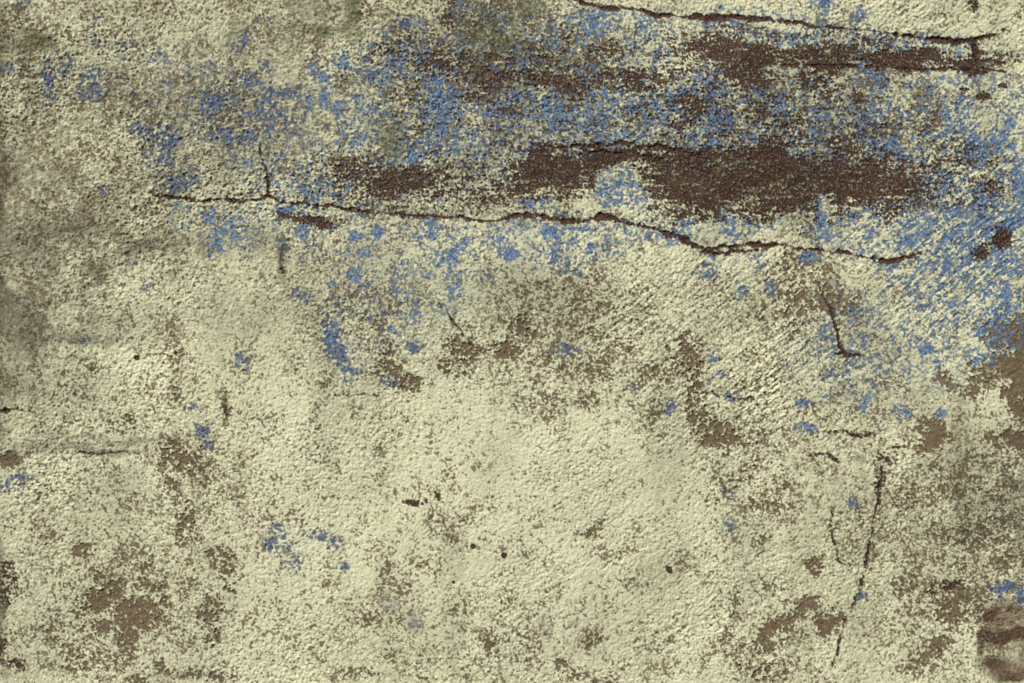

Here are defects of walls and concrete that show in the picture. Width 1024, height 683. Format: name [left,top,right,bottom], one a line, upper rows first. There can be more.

crack [568,0,1007,73]
crack [531,139,704,161]
crack [152,143,922,264]
crack [817,281,865,363]
crack [806,430,909,667]